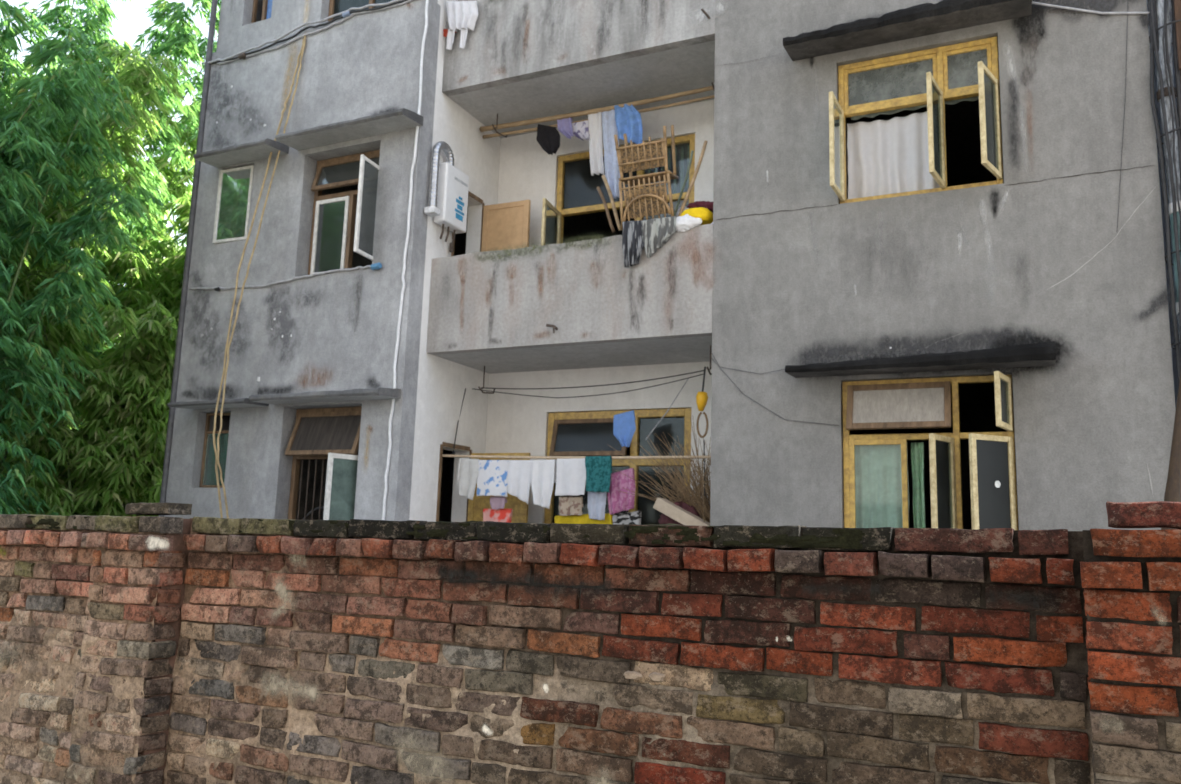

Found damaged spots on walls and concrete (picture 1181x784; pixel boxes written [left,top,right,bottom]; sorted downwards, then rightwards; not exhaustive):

damp [1007,0,1131,159]
damp [982,192,1008,214]
damp [192,274,217,367]
damp [265,290,295,361]
damp [800,328,1065,376]
damp [257,387,292,395]